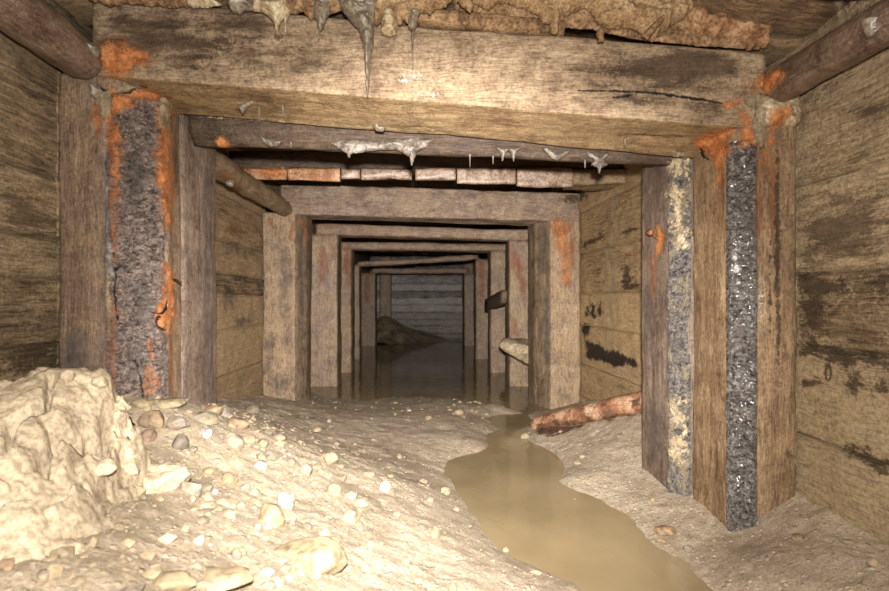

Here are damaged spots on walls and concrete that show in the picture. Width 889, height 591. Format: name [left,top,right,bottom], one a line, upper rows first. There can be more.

damp [97,10,268,69]
crack [579,89,722,104]
corrosion [754,69,784,94]
corrosion [93,38,175,228]
corrosion [694,100,798,228]
corrosion [651,224,665,298]
corrosion [163,262,175,334]
damp [580,302,637,368]
damp [797,269,889,398]
damp [843,443,889,476]